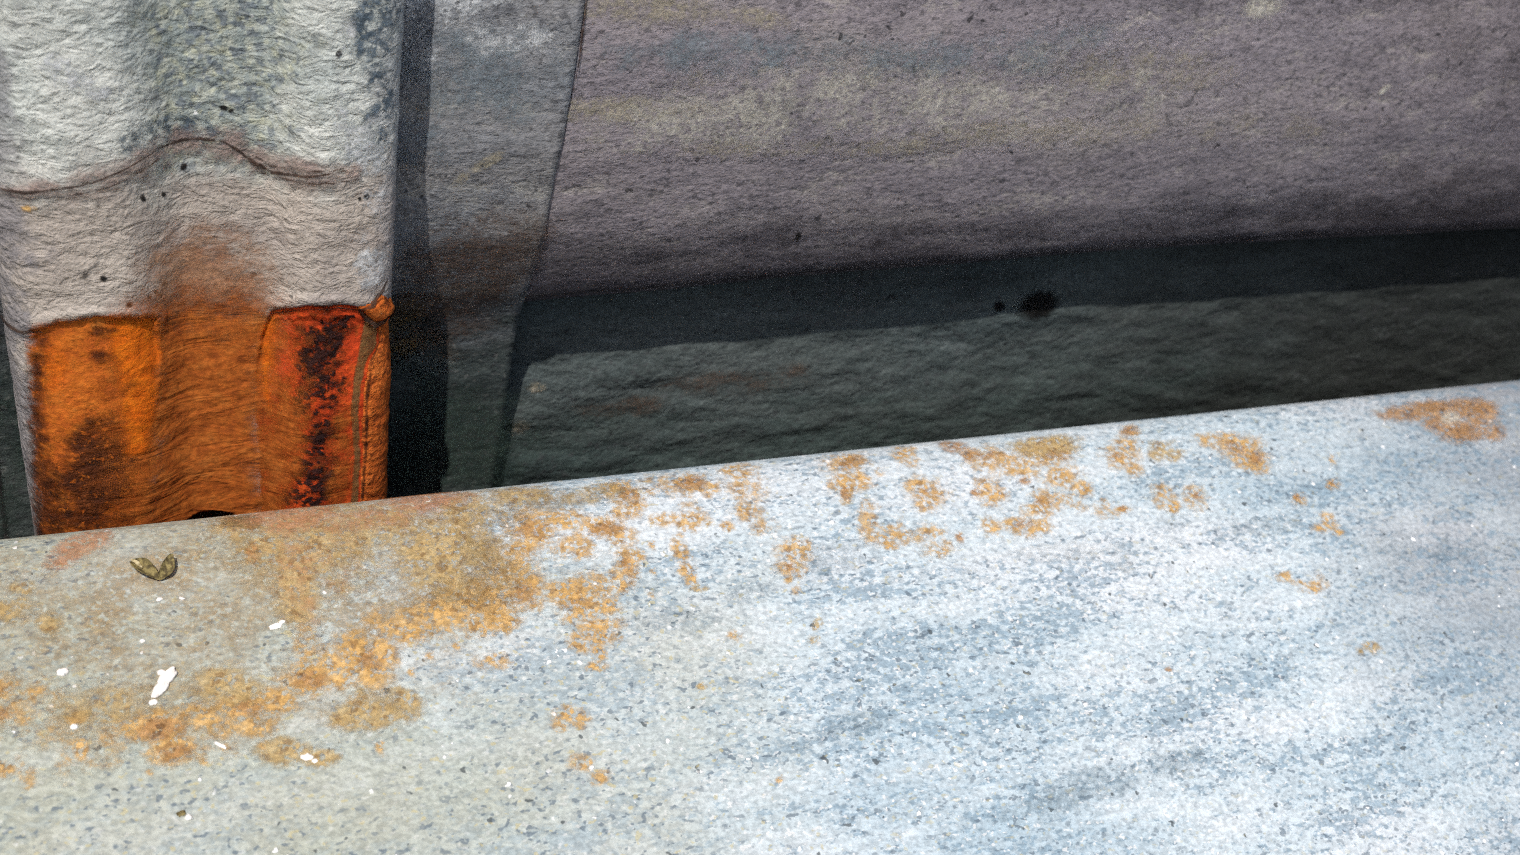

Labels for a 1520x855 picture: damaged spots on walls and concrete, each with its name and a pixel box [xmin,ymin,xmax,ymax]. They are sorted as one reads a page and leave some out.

rust [1378,399,1501,440]
rust [1107,427,1184,474]
rust [1199,433,1268,474]
rust [27,237,765,775]
rust [828,447,963,554]
rust [940,435,1126,535]
rust [1155,485,1205,513]
rust [1316,513,1343,535]
rust [778,538,811,593]
rust [0,764,33,788]